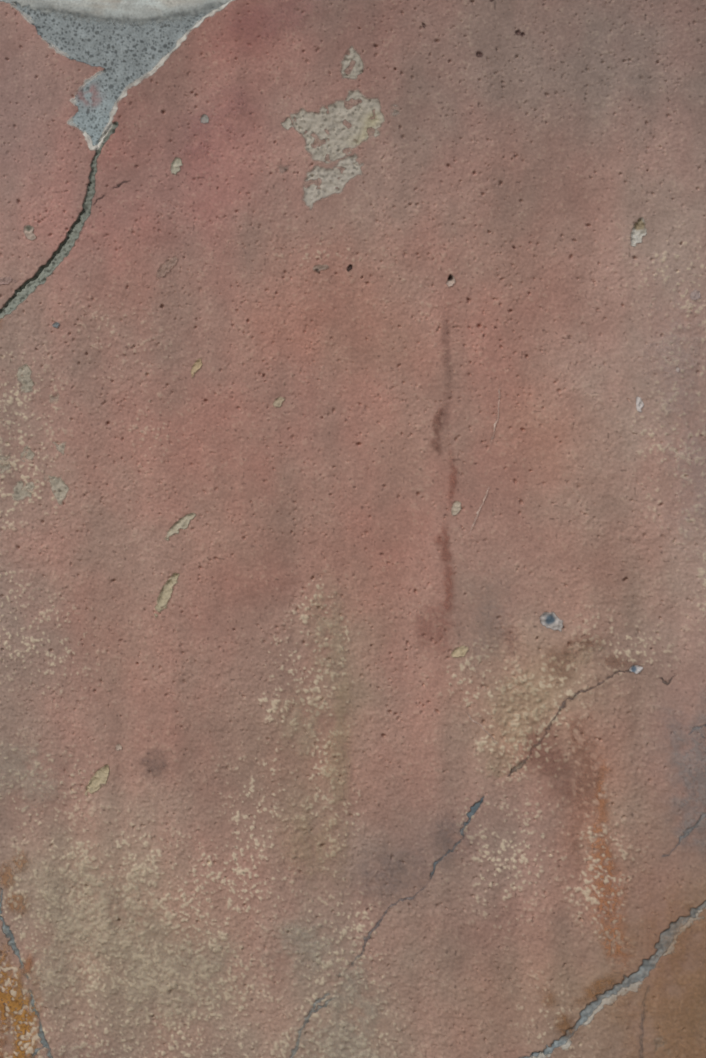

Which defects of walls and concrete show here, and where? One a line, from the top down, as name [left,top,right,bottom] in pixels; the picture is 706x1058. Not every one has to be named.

spalling [0,0,233,150]
spalling [281,47,399,208]
crack [0,122,127,319]
crack [0,889,53,1058]
crack [520,901,706,1058]